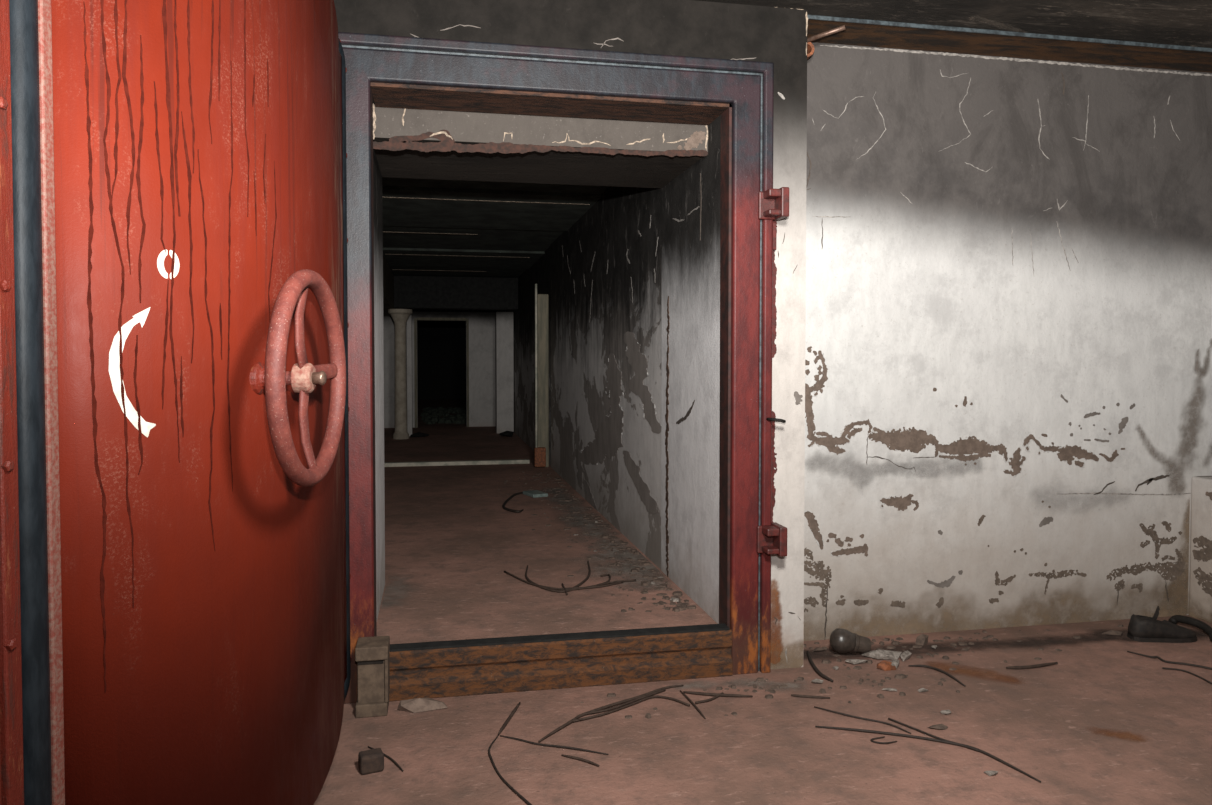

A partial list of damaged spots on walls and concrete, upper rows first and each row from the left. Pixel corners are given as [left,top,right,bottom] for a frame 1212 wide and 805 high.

peeling [794,346,1135,477]
water stain [1138,340,1212,637]
corrosion [771,581,783,664]
spalling [804,510,905,612]
peeling [927,570,963,608]
water stain [771,592,1135,670]
peeling [989,563,1087,604]
spalling [1107,521,1212,597]